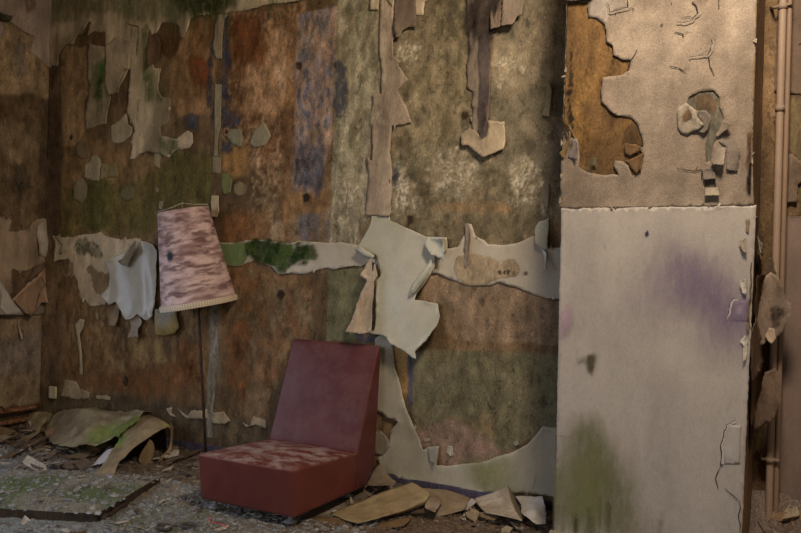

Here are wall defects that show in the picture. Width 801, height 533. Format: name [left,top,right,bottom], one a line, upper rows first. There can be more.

spalling [76,25,105,48]
leakage [464,0,528,139]
peeling [559,0,757,210]
crack [670,38,716,74]
crack [671,0,719,37]
peeling [774,0,801,204]
peeling [739,216,765,450]
crack [715,421,749,528]